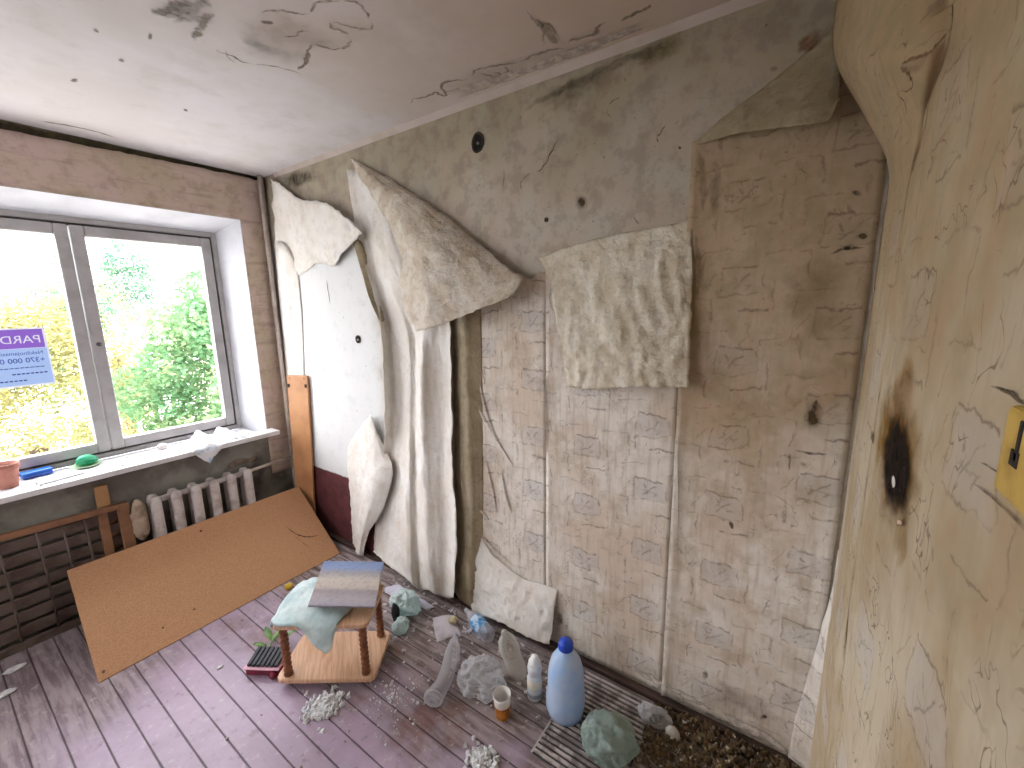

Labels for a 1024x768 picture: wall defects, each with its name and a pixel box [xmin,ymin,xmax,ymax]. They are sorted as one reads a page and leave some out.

leakage [153,0,211,38]